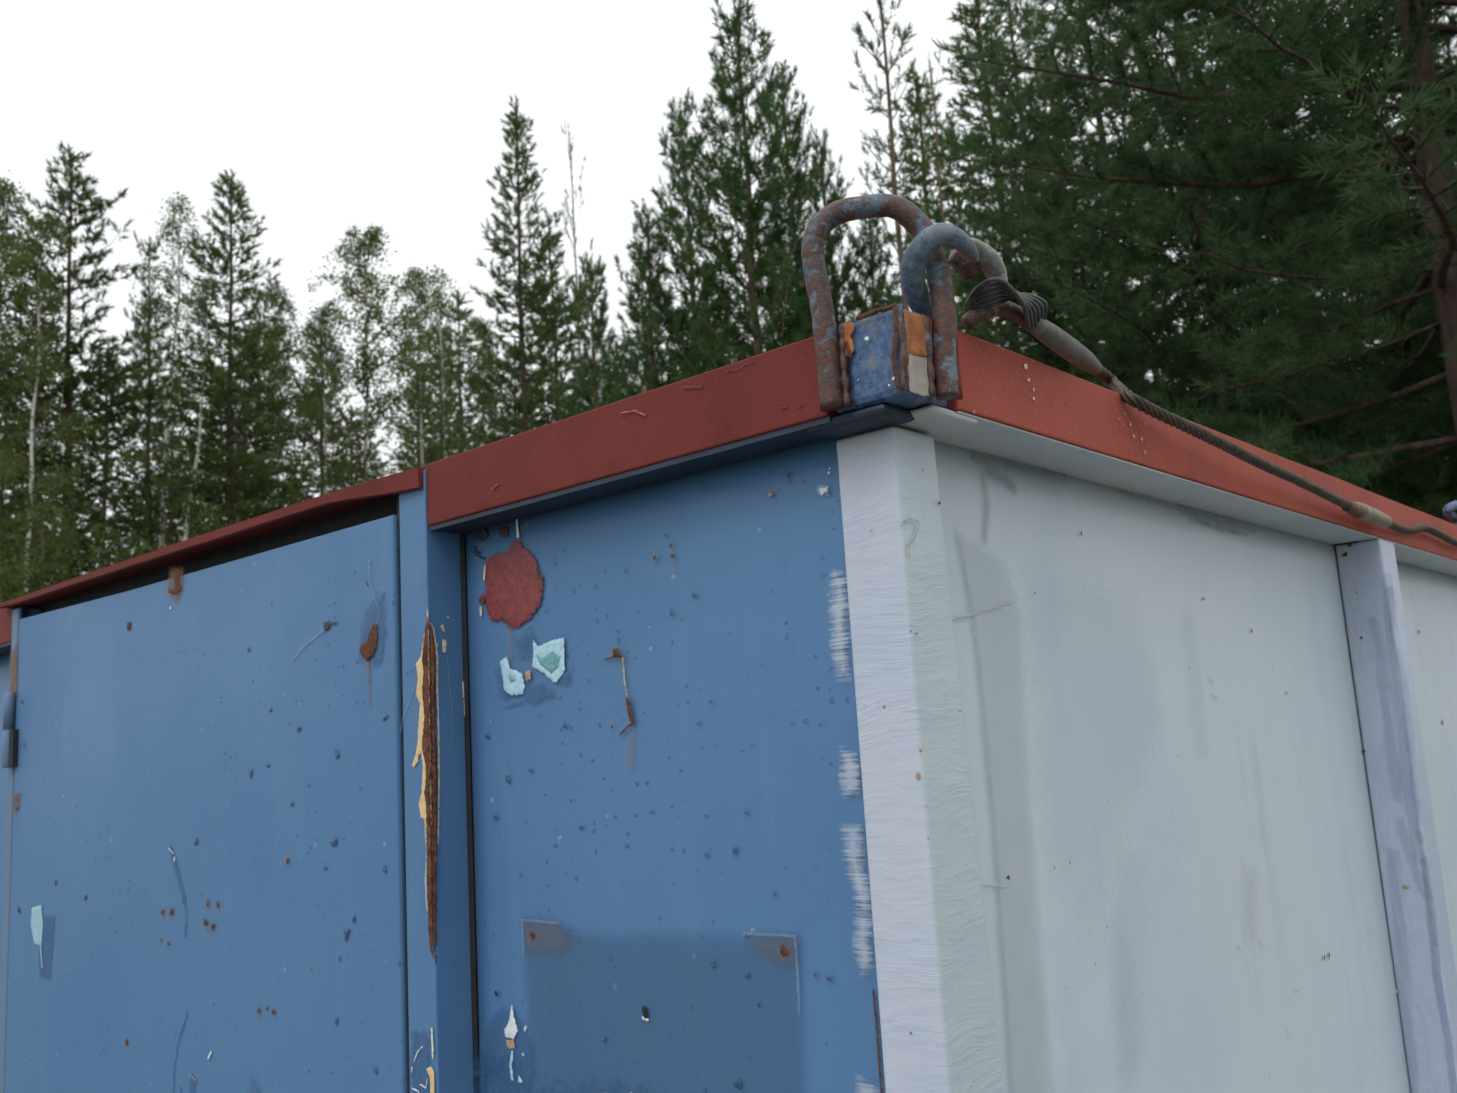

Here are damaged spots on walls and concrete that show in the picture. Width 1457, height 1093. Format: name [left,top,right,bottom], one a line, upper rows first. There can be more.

corrosion [843,304,933,397]
peeling [472,527,508,581]
peeling [496,632,569,707]
corrosion [611,697,635,735]
peeling [31,906,54,979]
peeling [410,1028,435,1093]
peeling [480,1006,533,1089]